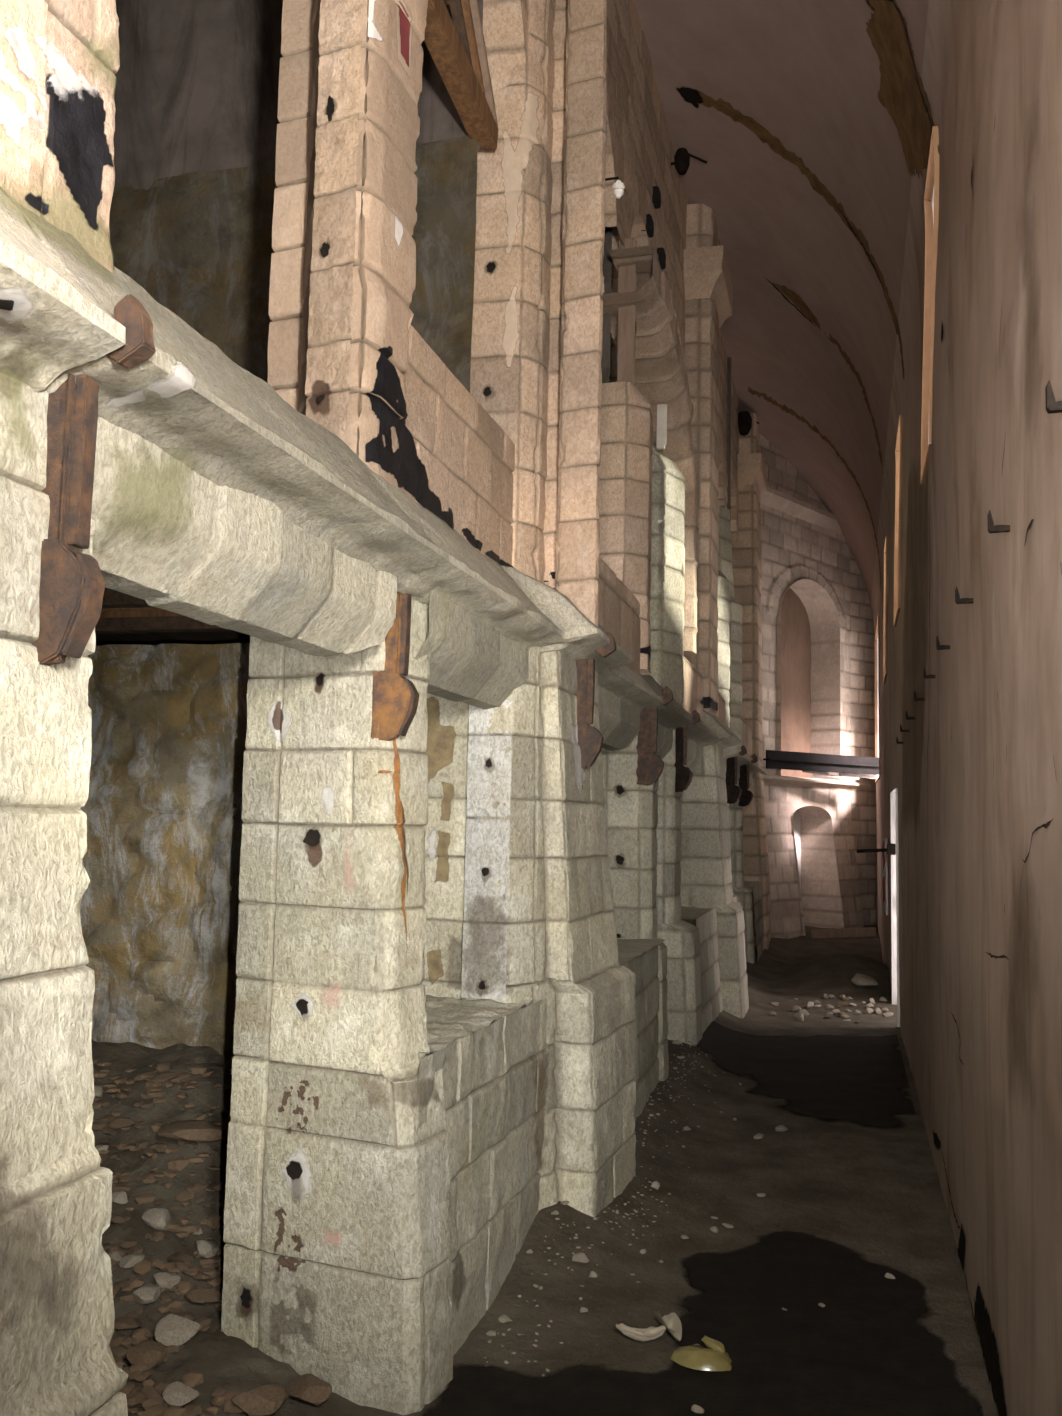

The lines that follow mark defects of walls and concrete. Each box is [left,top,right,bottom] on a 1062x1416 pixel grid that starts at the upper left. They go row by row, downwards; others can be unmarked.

peeling [25,193,49,215]
peeling [45,74,114,230]
peeling [866,0,939,177]
peeling [365,346,515,568]
corrosion [378,739,409,947]
crack [1004,819,1053,910]
corrosion [276,1080,319,1134]